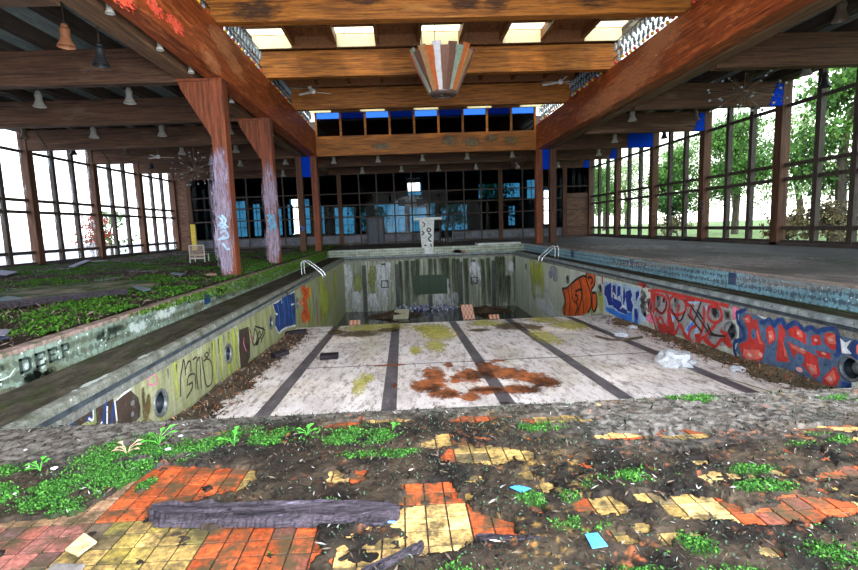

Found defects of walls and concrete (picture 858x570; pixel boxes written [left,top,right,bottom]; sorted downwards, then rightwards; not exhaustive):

peeling [211,151,233,273]
peeling [263,165,279,263]
water stain [309,256,515,337]
corrosion [410,359,561,405]